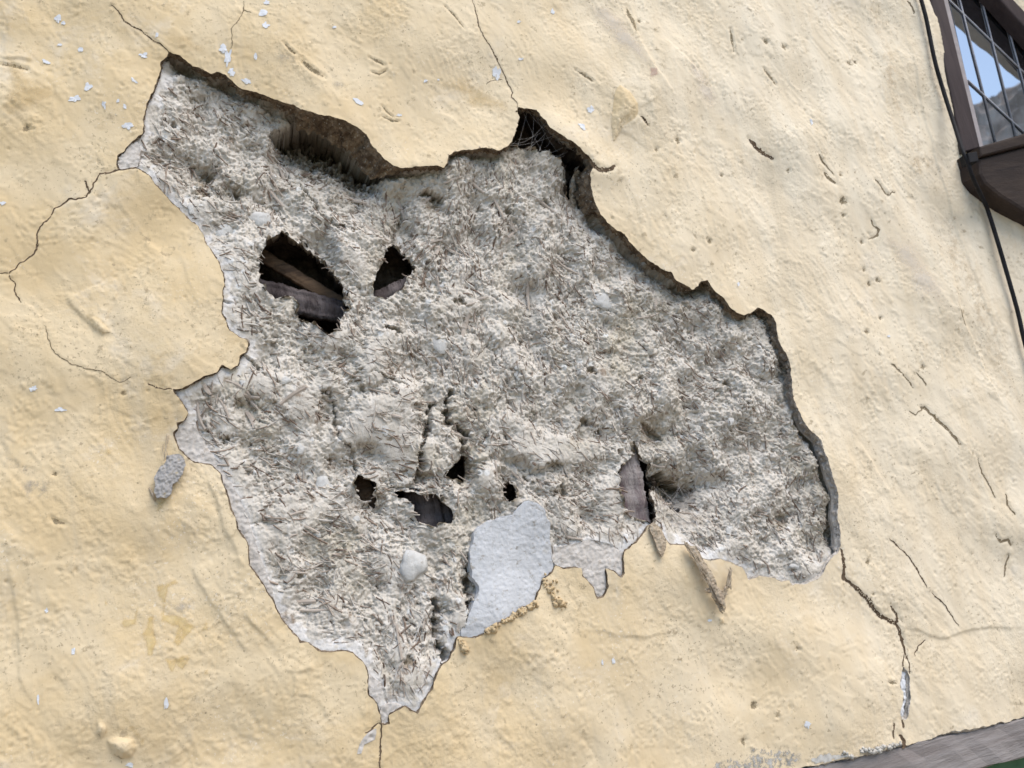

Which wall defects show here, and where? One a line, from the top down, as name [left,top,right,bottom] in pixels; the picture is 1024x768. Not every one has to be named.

crack [112,5,169,52]
crack [472,0,518,106]
crack [0,167,148,302]
crack [44,325,171,390]
spalling [116,44,841,754]
crack [893,364,1015,577]
crack [840,548,925,674]
crack [890,539,959,626]